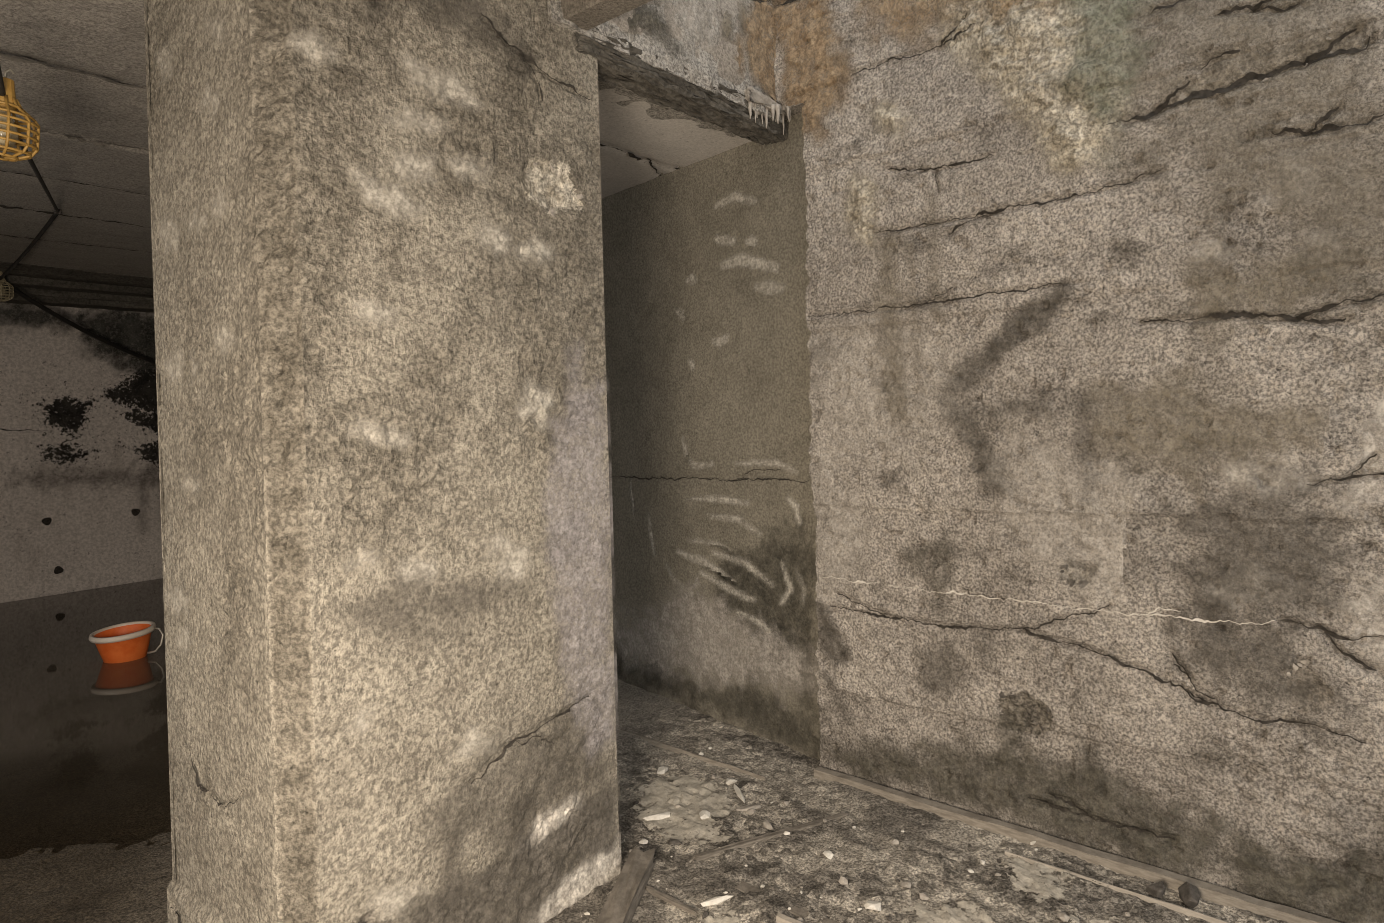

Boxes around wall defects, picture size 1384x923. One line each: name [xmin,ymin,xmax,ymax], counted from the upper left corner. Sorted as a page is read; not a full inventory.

crack [1218,0,1298,15]
crack [851,13,974,76]
crack [1107,28,1370,125]
crack [1272,107,1384,135]
crack [888,154,994,186]
crack [874,170,1160,235]
crack [808,283,1065,317]
crack [1140,294,1384,324]
leakage [0,303,156,380]
crack [1307,454,1384,486]
crack [819,576,1384,743]
crack [471,696,589,784]